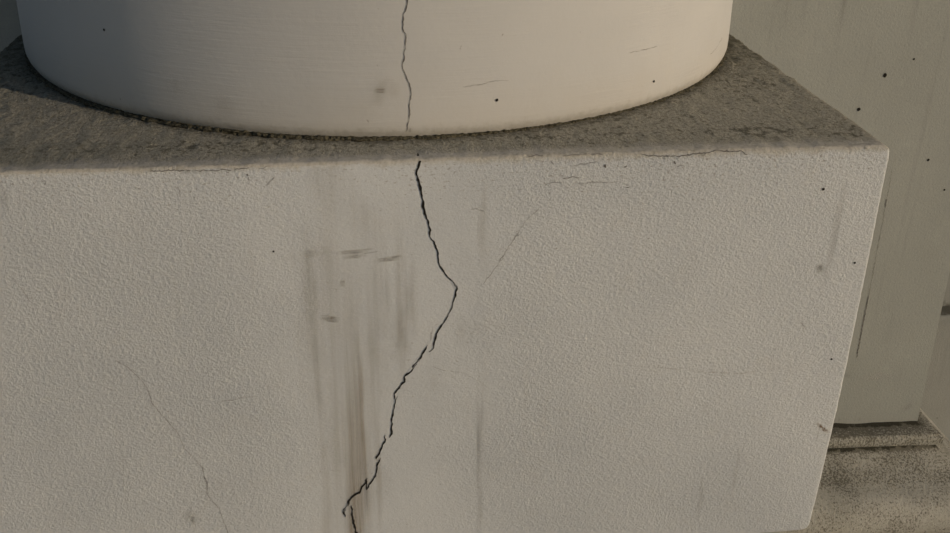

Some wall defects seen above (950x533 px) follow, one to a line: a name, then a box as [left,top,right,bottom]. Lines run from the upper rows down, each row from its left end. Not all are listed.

crack [402,0,412,131]
crack [341,153,458,533]